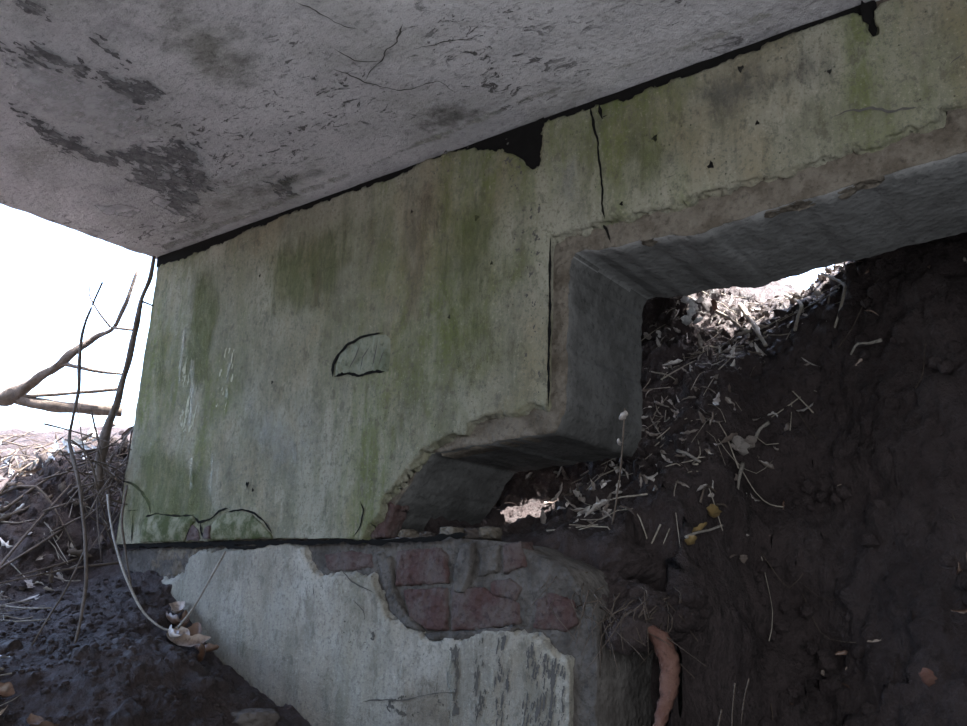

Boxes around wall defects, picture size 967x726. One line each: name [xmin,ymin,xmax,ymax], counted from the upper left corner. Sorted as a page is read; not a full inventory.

crack [835,106,916,116]
crack [156,0,877,267]
spalling [501,117,544,190]
spalling [764,185,818,218]
flaking render [370,501,409,539]
spalling [325,541,579,641]
peeling [386,695,419,717]